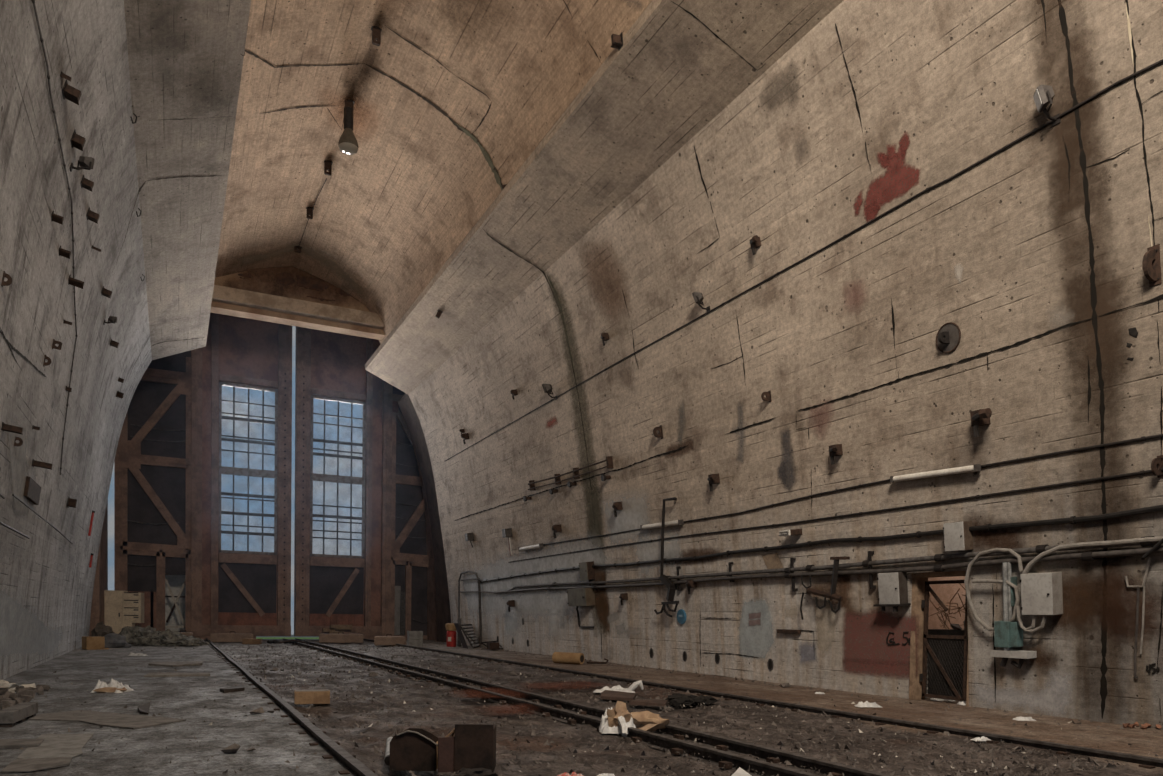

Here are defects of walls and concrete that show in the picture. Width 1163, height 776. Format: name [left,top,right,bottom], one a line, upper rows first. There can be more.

crack [241,26,503,190]
crack [483,229,558,305]
crack [455,446,687,521]
leakage [552,284,602,568]
leakage [779,432,795,490]
crack [727,0,1163,719]
leakage [1036,0,1126,597]